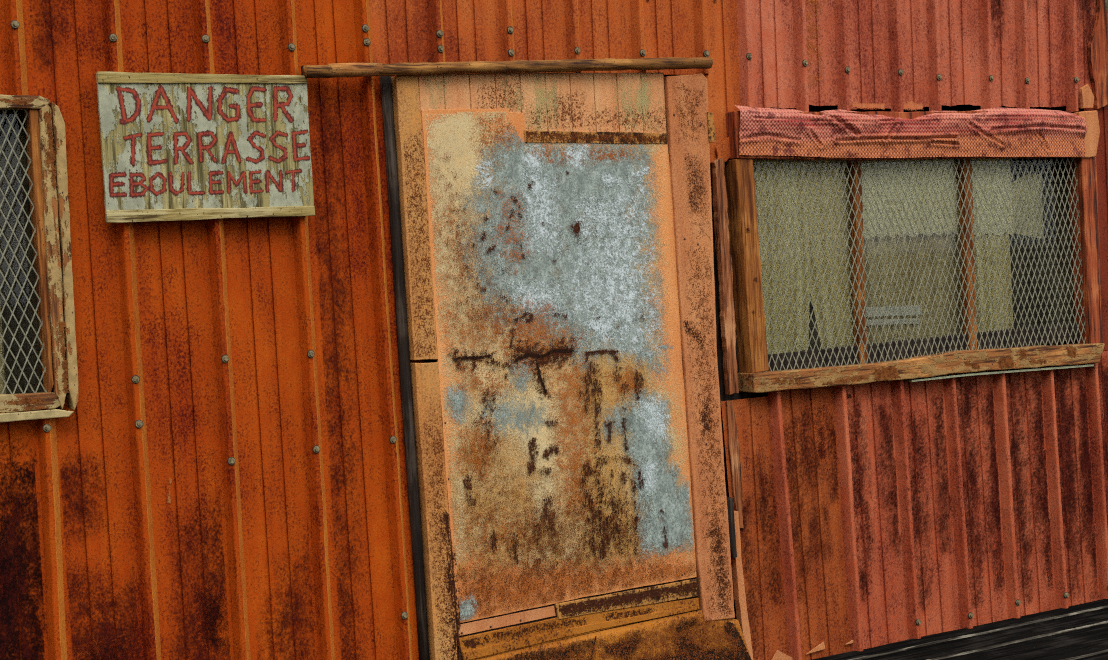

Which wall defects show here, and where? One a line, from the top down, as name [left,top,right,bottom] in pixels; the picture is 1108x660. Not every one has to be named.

peeling [44,111,57,188]
rust [478,82,705,144]
peeling [3,397,52,411]
peeling [57,321,69,393]
peeling [426,78,694,558]
rust [404,127,781,660]
rust [784,407,838,592]
rust [847,392,901,600]
rust [906,394,951,610]
rust [955,373,1005,607]
rust [1005,358,1108,603]